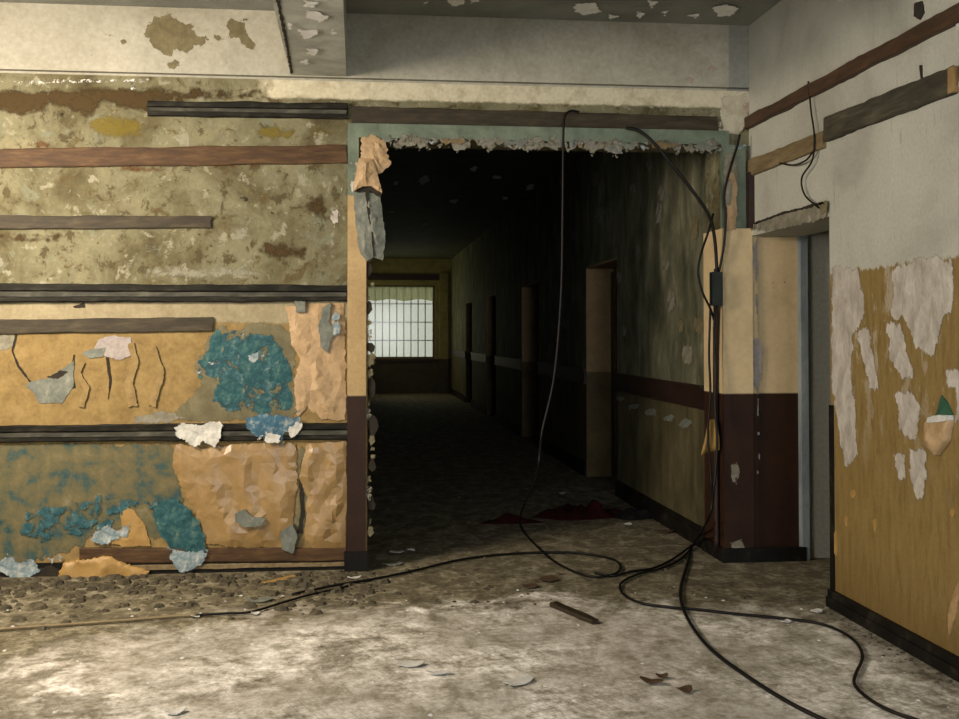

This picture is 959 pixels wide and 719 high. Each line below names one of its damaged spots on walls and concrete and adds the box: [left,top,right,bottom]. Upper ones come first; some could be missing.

peeling [573,3,619,20]
peeling [712,4,739,17]
water stain [0,88,254,137]
peeling [318,303,341,352]
peeling [341,93,749,537]
peeling [830,265,879,467]
peeling [884,255,959,499]
peeling [0,322,302,577]
peeling [280,489,308,553]
peeling [834,516,849,556]